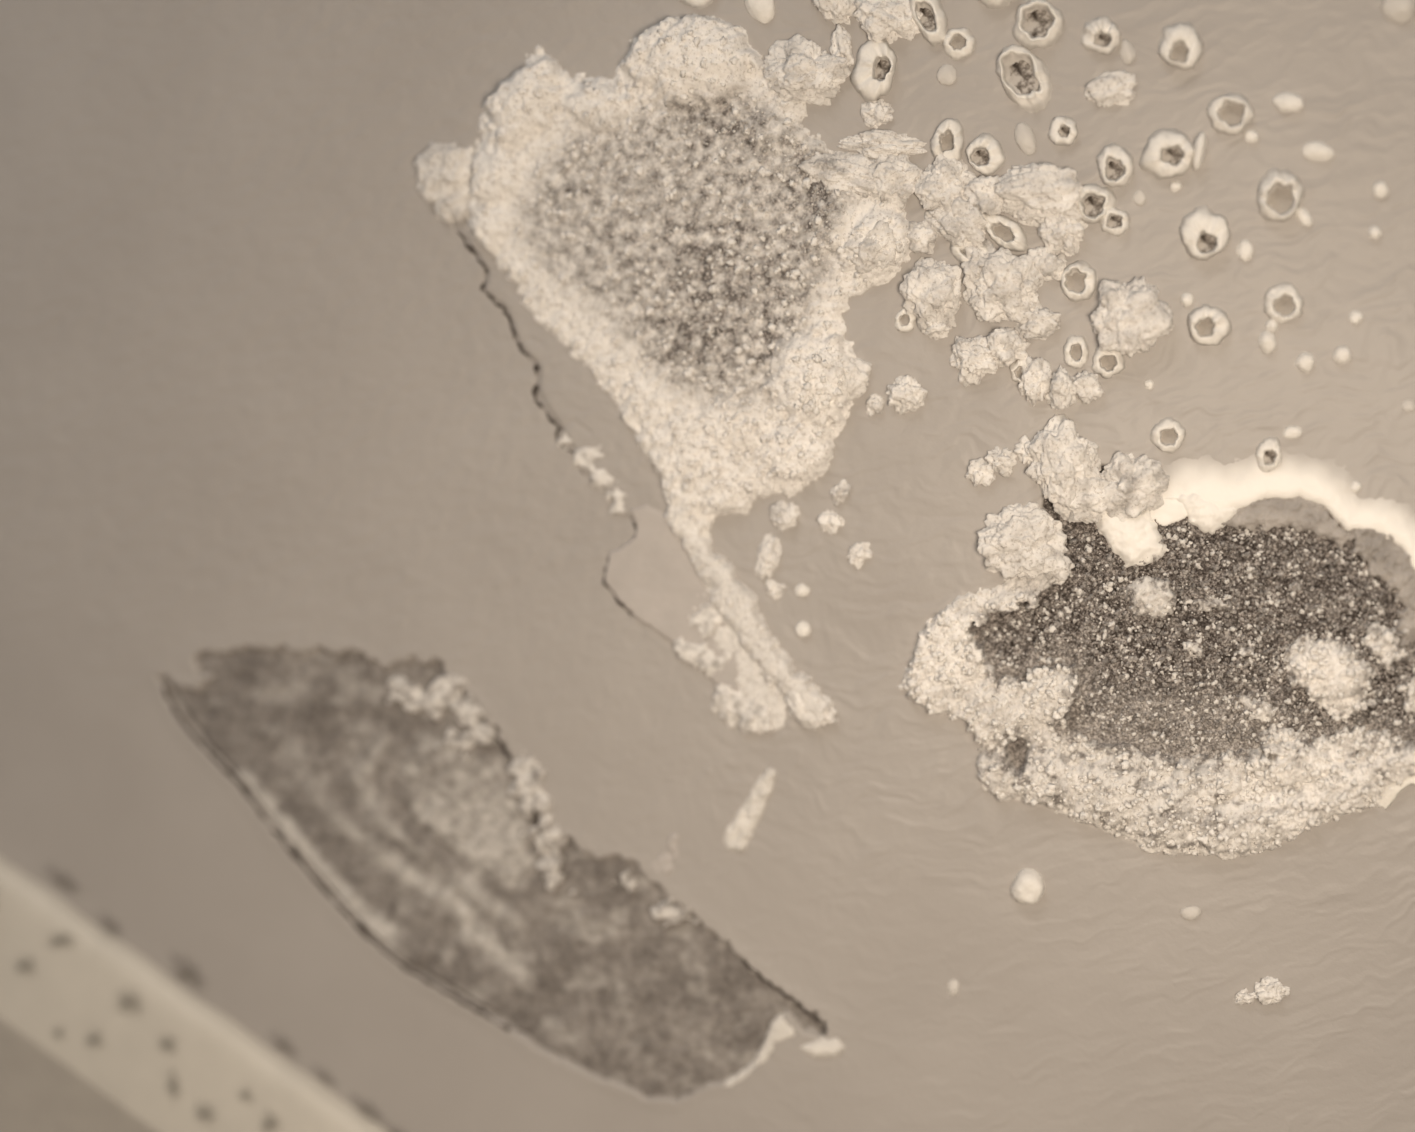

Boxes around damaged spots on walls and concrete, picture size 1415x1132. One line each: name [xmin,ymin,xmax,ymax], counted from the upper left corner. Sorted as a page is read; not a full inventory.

crack [454,222,585,475]
crack [602,518,636,618]
efflorescence [414,13,911,735]
spalling [898,414,1415,861]
peeling [160,645,845,1098]